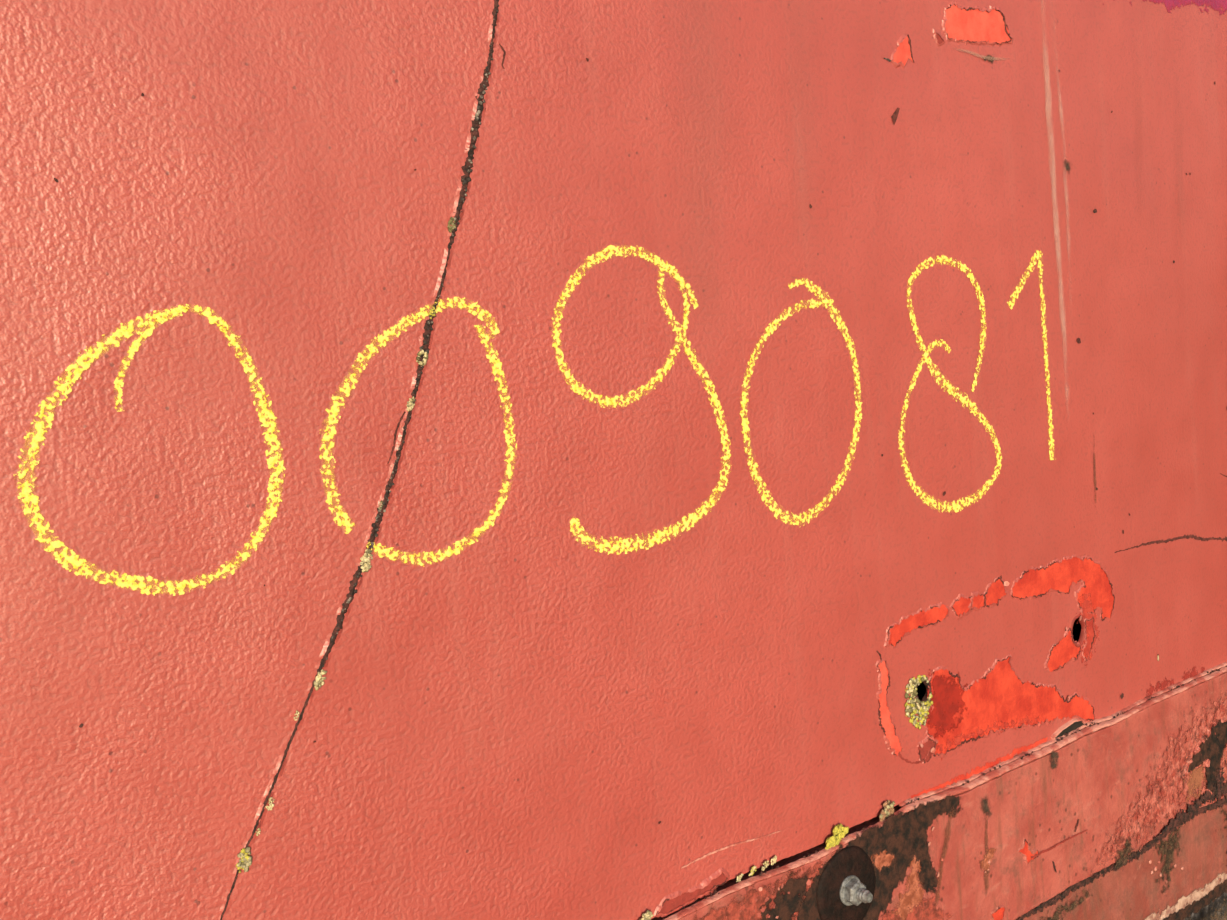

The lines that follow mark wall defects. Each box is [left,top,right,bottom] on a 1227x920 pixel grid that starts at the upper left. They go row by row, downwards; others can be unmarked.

peeling [884,34,914,69]
peeling [933,1,1014,46]
crack [216,0,506,920]
crack [1115,534,1227,553]
peeling [875,554,1115,798]
rust [1184,717,1227,799]
rust [694,794,963,920]
rust [979,799,996,889]
rust [1163,880,1227,920]